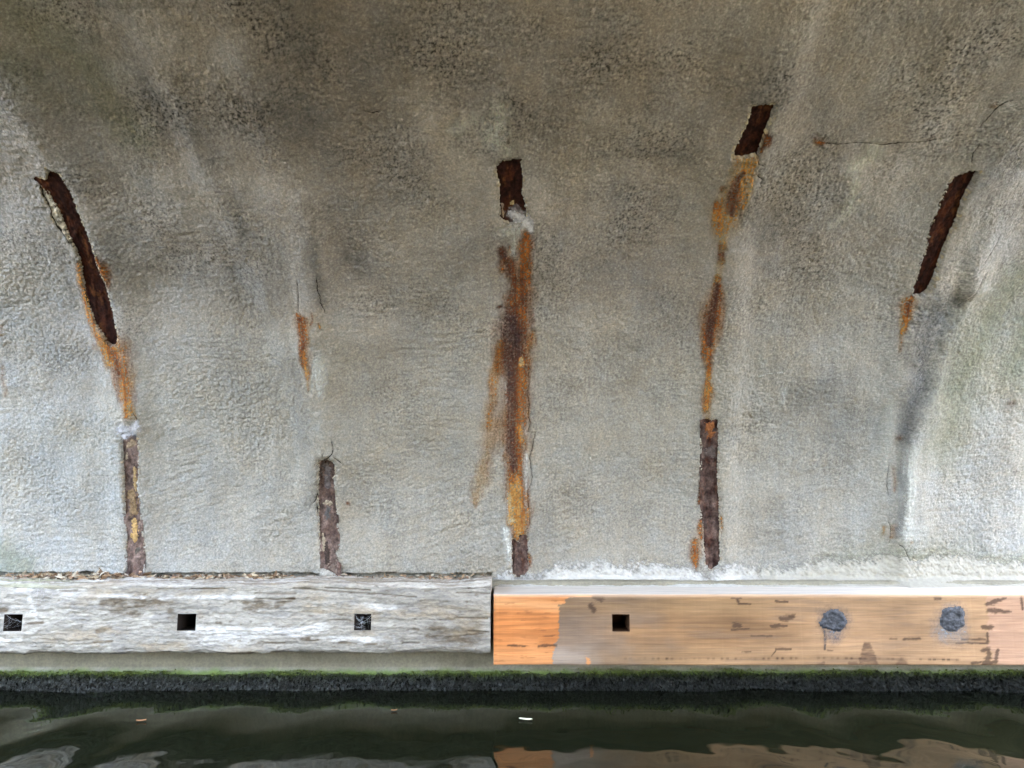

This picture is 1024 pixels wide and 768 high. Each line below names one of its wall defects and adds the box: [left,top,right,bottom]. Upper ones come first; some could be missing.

spalling [34,167,119,344]
rust [75,263,136,419]
rust [296,313,321,380]
rust [481,230,536,541]
spalling [496,159,528,226]
rust [700,133,773,420]
spalling [731,103,775,160]
crack [828,137,945,145]
rust [899,295,914,350]
damp [897,307,944,540]
spalling [912,170,982,294]
rust [690,519,703,569]